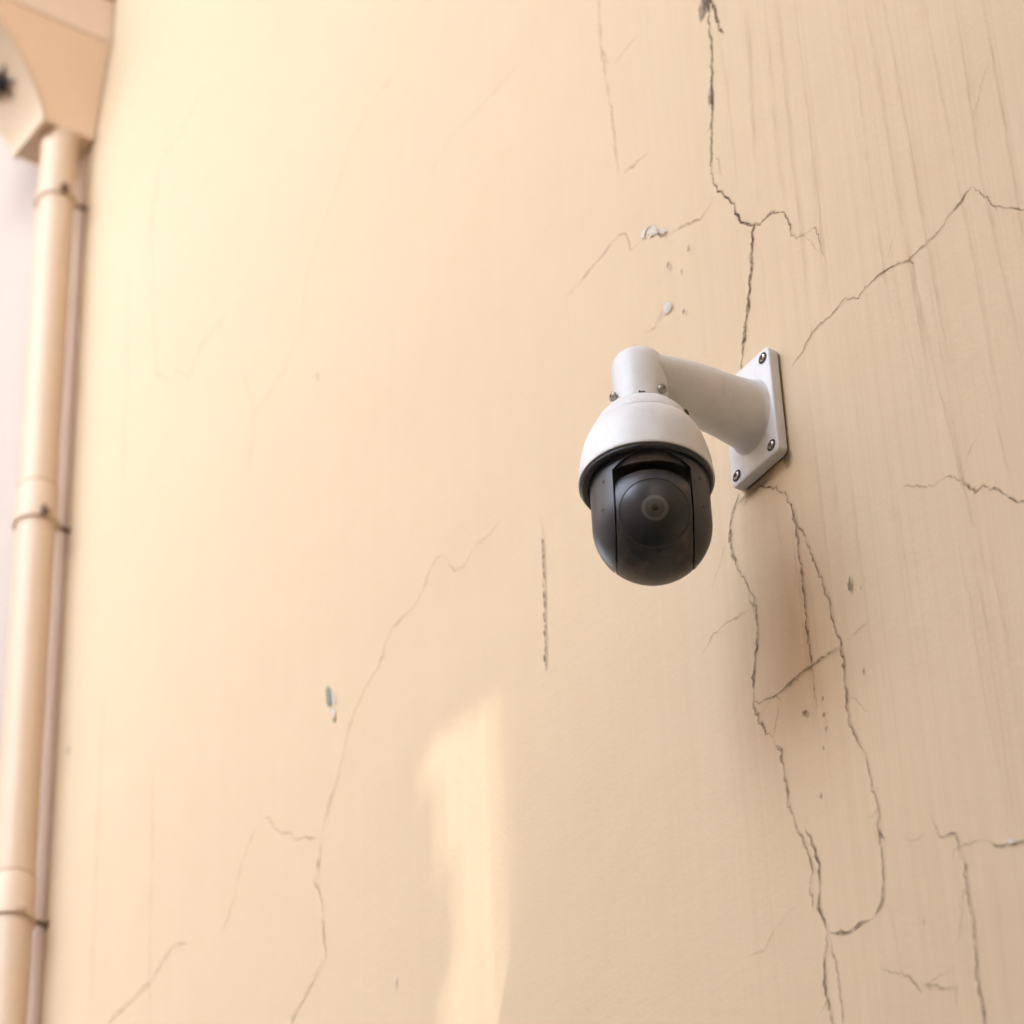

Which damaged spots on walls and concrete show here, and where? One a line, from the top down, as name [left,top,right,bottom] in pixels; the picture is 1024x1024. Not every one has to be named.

crack [699,0,724,113]
crack [710,138,791,368]
crack [945,476,1023,503]
crack [729,485,863,762]
peeling [326,686,336,722]
crack [805,830,868,938]
crack [941,832,1024,905]
crack [973,933,985,1023]